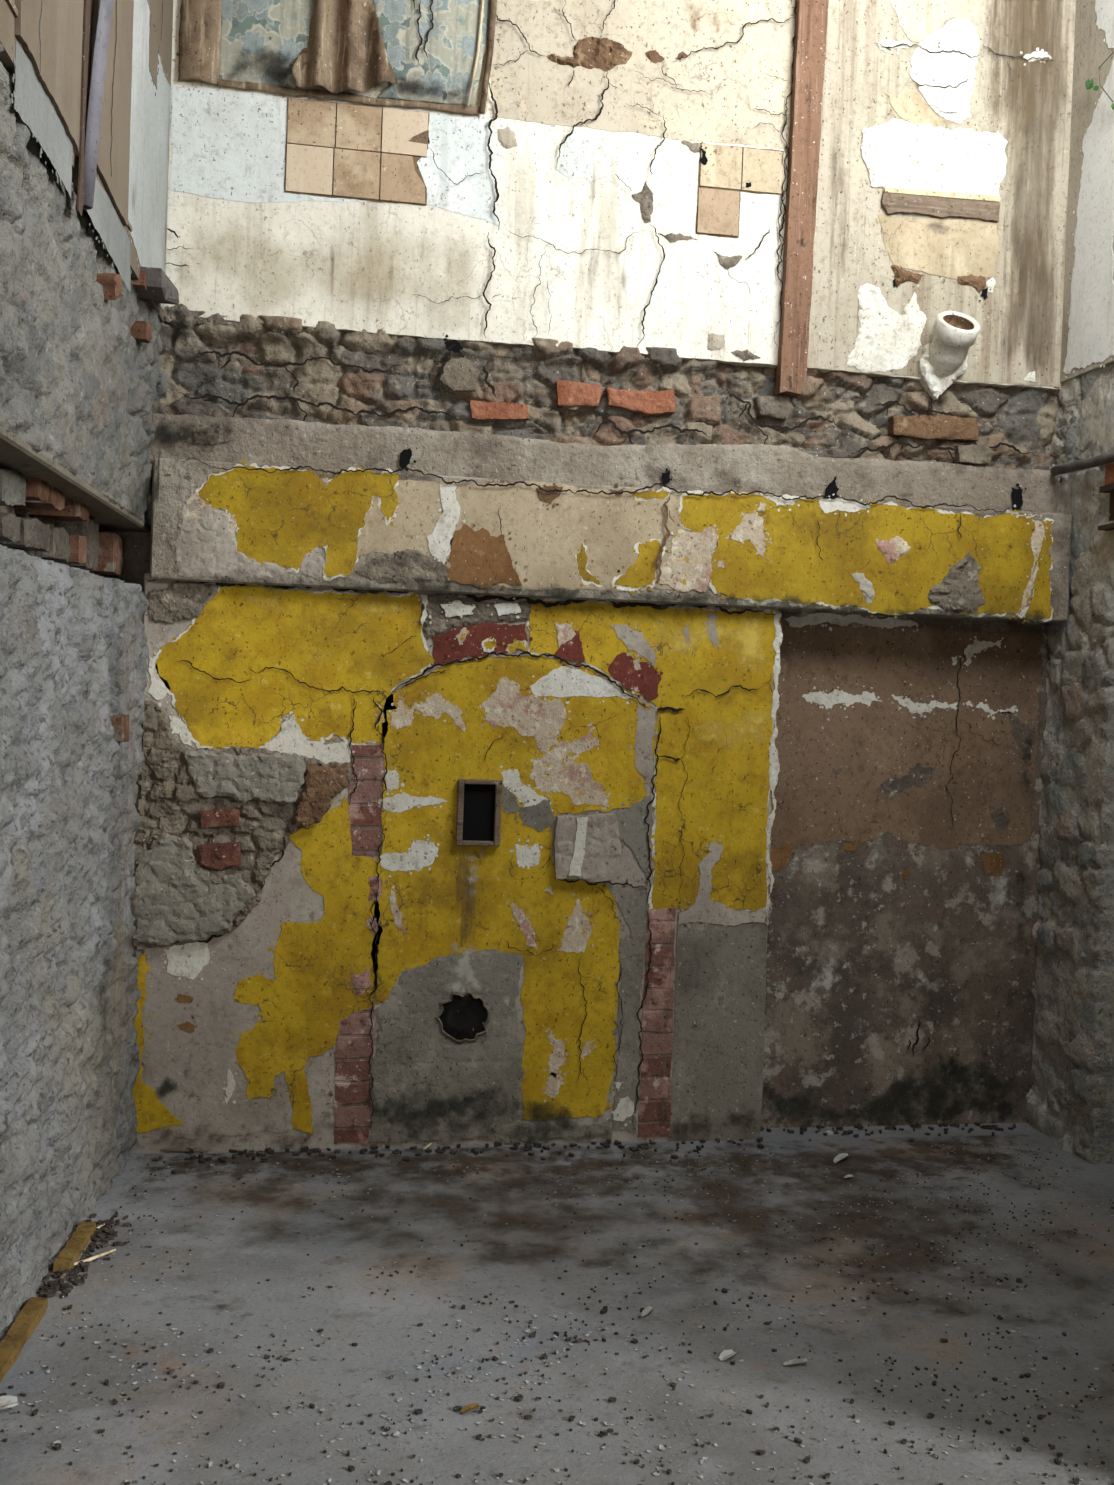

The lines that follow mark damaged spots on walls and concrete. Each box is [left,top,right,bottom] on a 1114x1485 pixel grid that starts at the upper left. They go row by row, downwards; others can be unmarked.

peeling [265,0,796,153]
crack [412,0,797,398]
peeling [879,86,961,128]
peeling [876,207,1004,293]
damp [1012,0,1061,366]
peeling [1063,0,1114,378]
crack [177,636,772,1134]
peeling [110,458,1056,1148]
damp [763,1059,1017,1126]